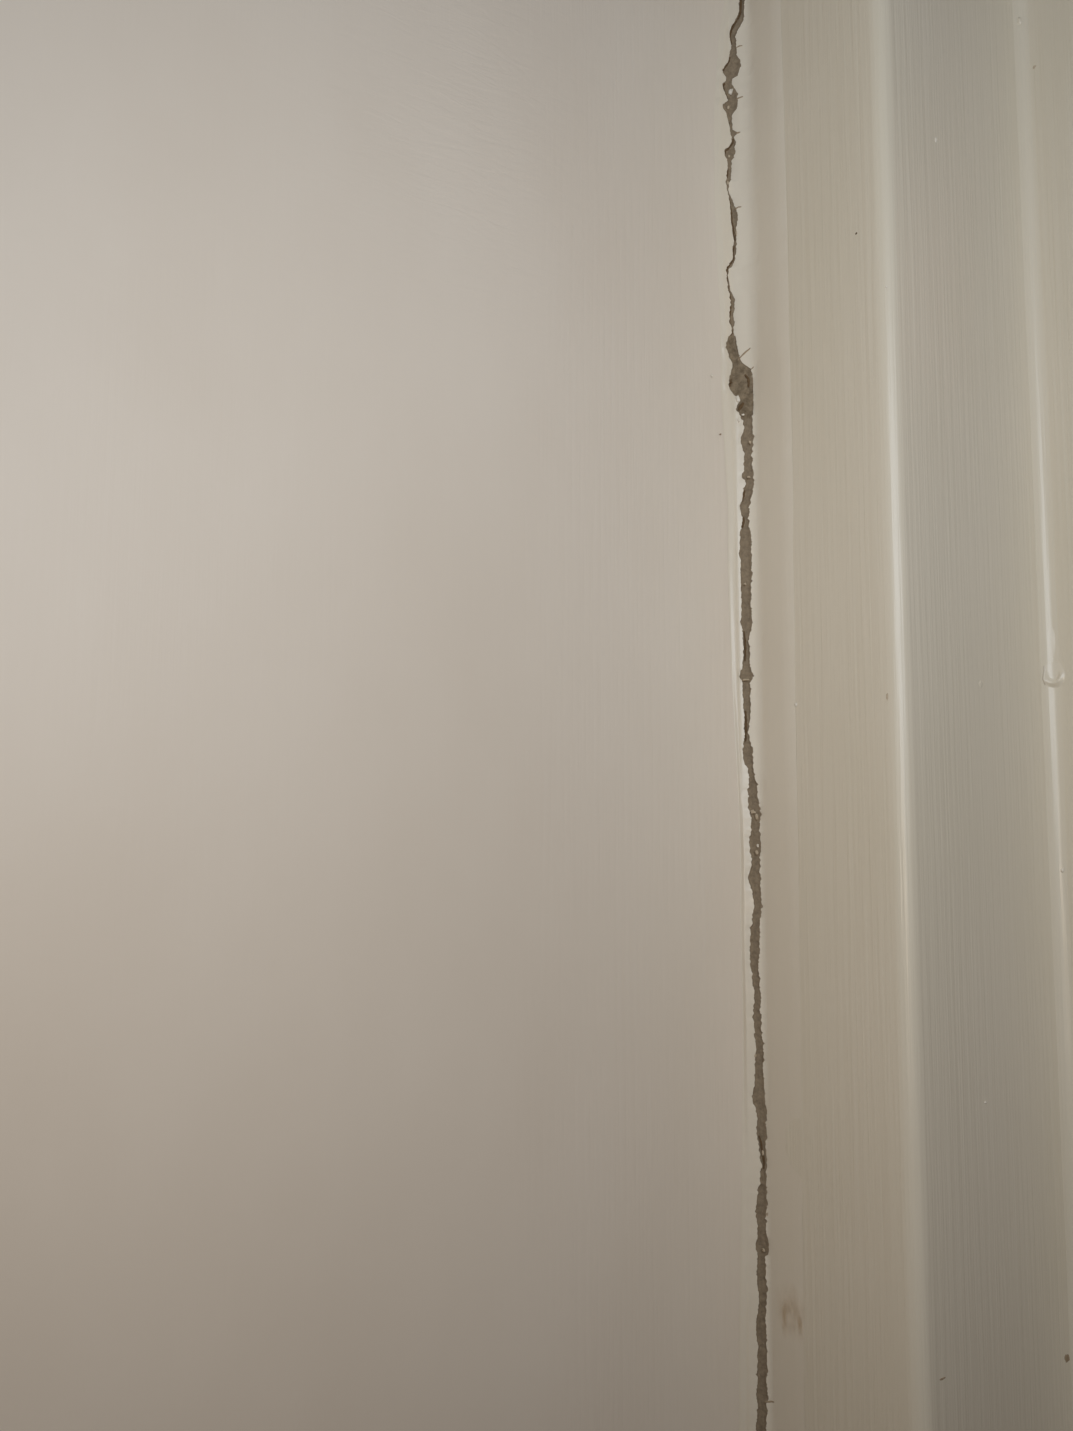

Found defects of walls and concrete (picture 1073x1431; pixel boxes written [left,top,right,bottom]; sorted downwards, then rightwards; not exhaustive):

crack [722,0,774,1431]